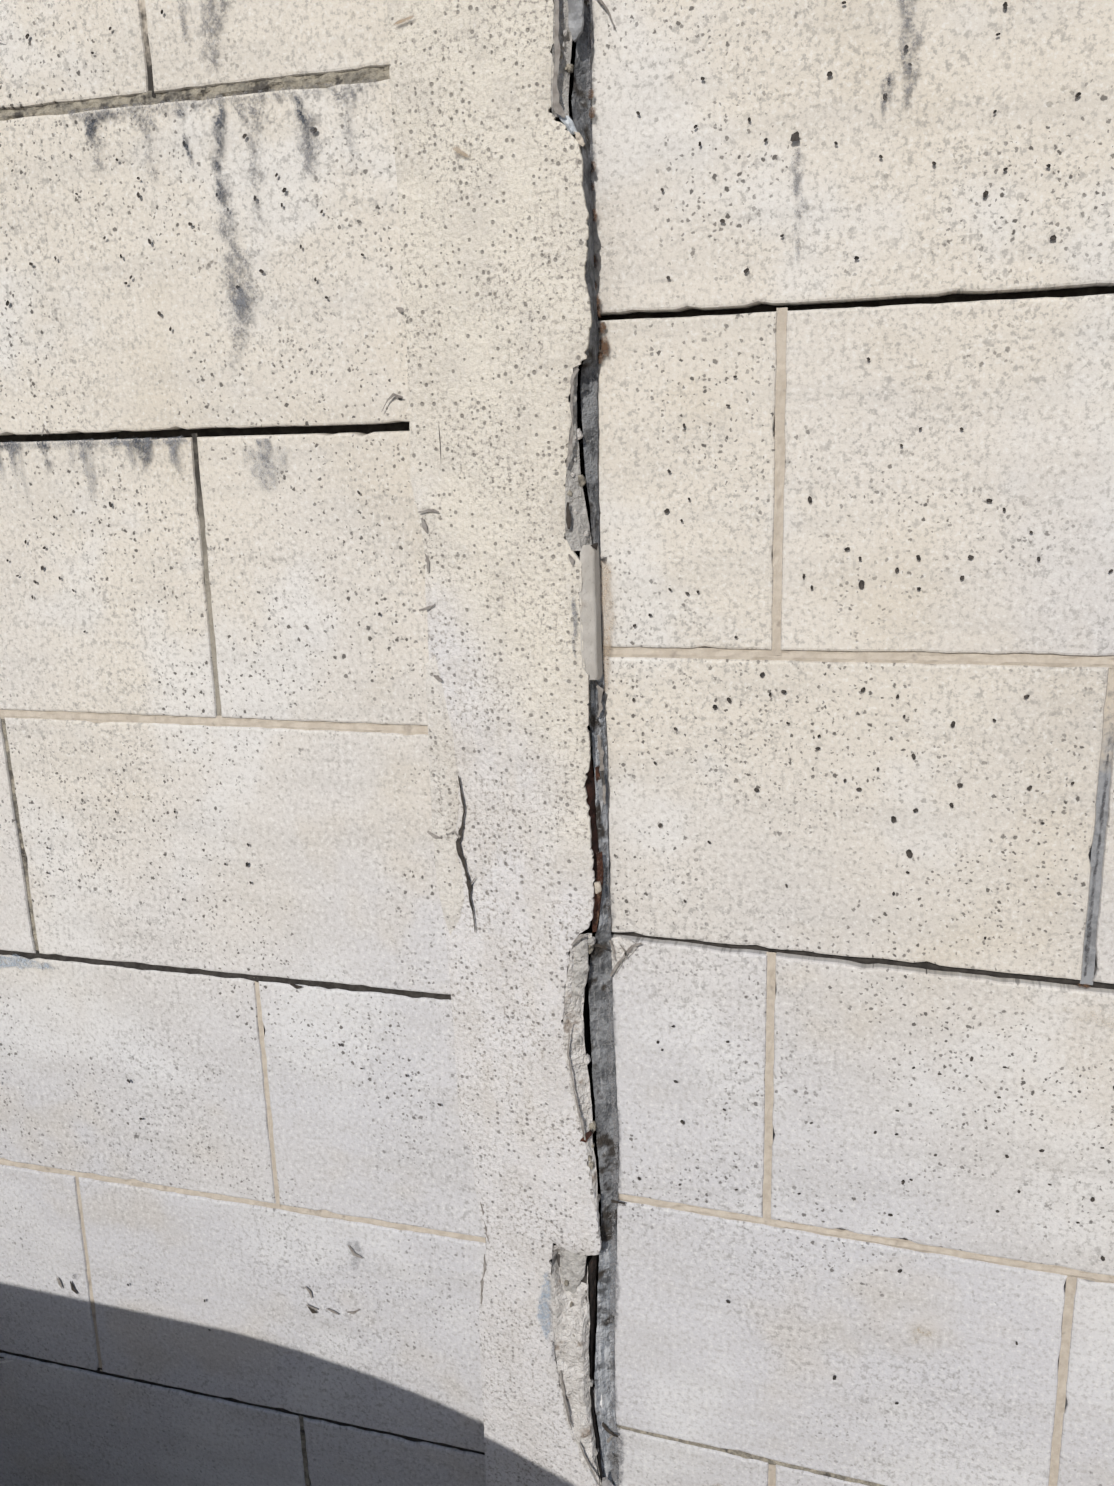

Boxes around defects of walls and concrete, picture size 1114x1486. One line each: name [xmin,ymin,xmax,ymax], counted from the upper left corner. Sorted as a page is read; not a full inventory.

leakage [84,112,114,164]
leakage [212,104,255,350]
leakage [294,96,315,173]
crack [447,776,475,931]
rust [585,748,604,932]
crack [593,936,642,976]
spalling [563,933,602,1243]
spalling [552,1245,602,1486]